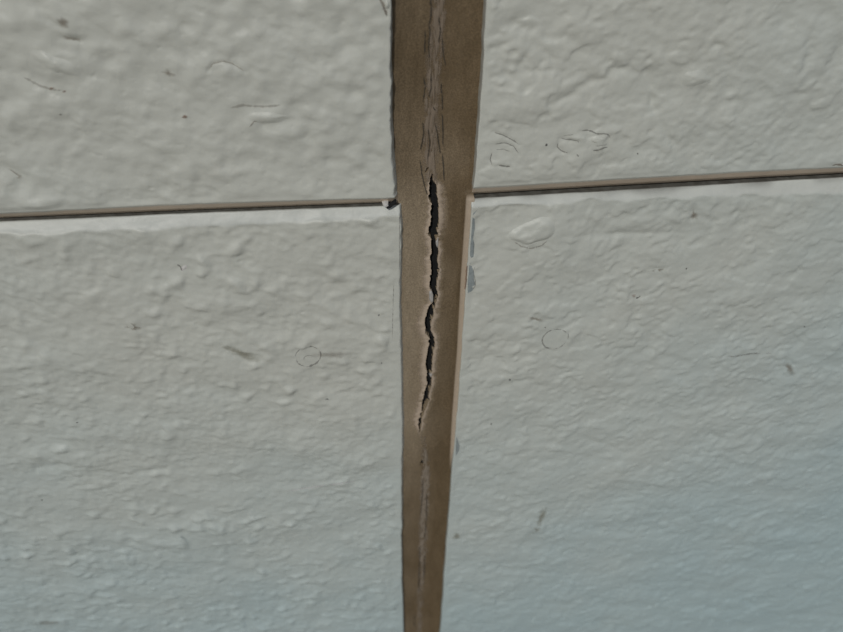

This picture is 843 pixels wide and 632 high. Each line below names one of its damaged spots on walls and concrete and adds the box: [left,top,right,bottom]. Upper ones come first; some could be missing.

crack [413,167,444,432]